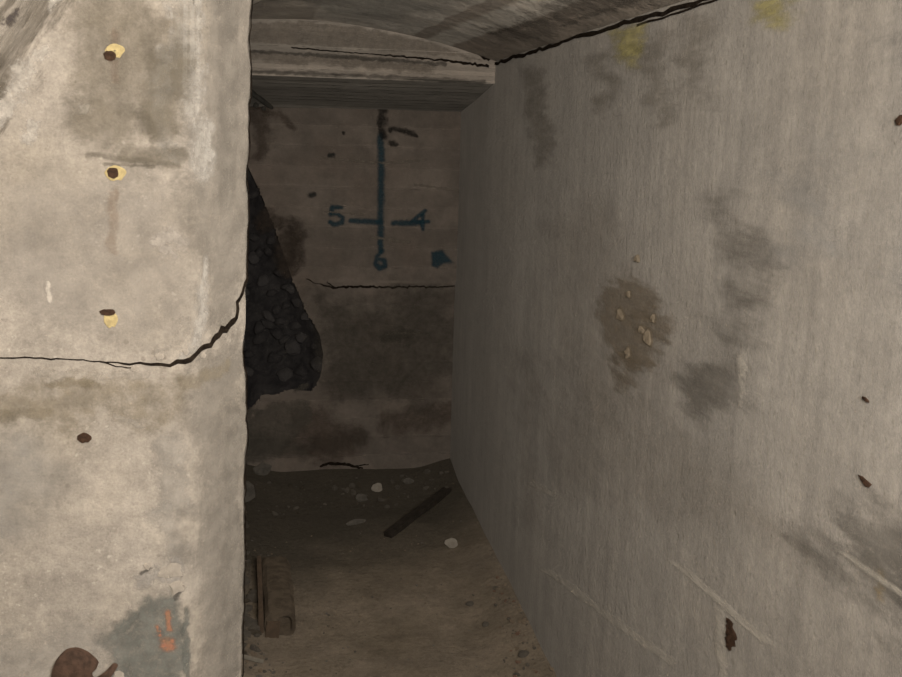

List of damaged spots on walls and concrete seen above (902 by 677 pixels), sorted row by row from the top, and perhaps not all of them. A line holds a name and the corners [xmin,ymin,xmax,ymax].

damp [0,0,57,130]
crack [0,0,253,677]
damp [74,0,470,346]
crack [306,278,455,289]
crack [291,0,717,68]
damp [152,347,361,677]